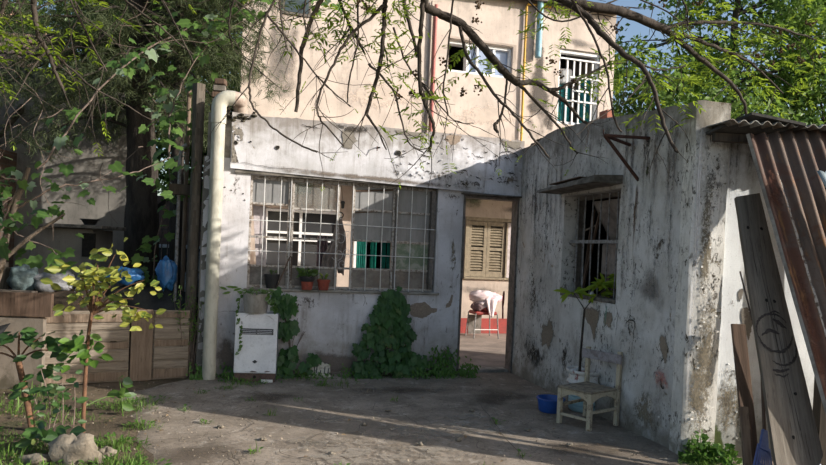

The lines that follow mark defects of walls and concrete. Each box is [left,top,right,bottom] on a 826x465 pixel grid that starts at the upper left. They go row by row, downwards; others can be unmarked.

spalling [231,125,244,163]
spalling [444,133,464,145]
peeling [415,169,480,199]
damp [688,138,702,370]
peeling [410,292,454,320]
peeling [526,275,553,355]
peeling [580,302,613,347]
damp [524,341,542,366]
peeling [657,335,669,369]